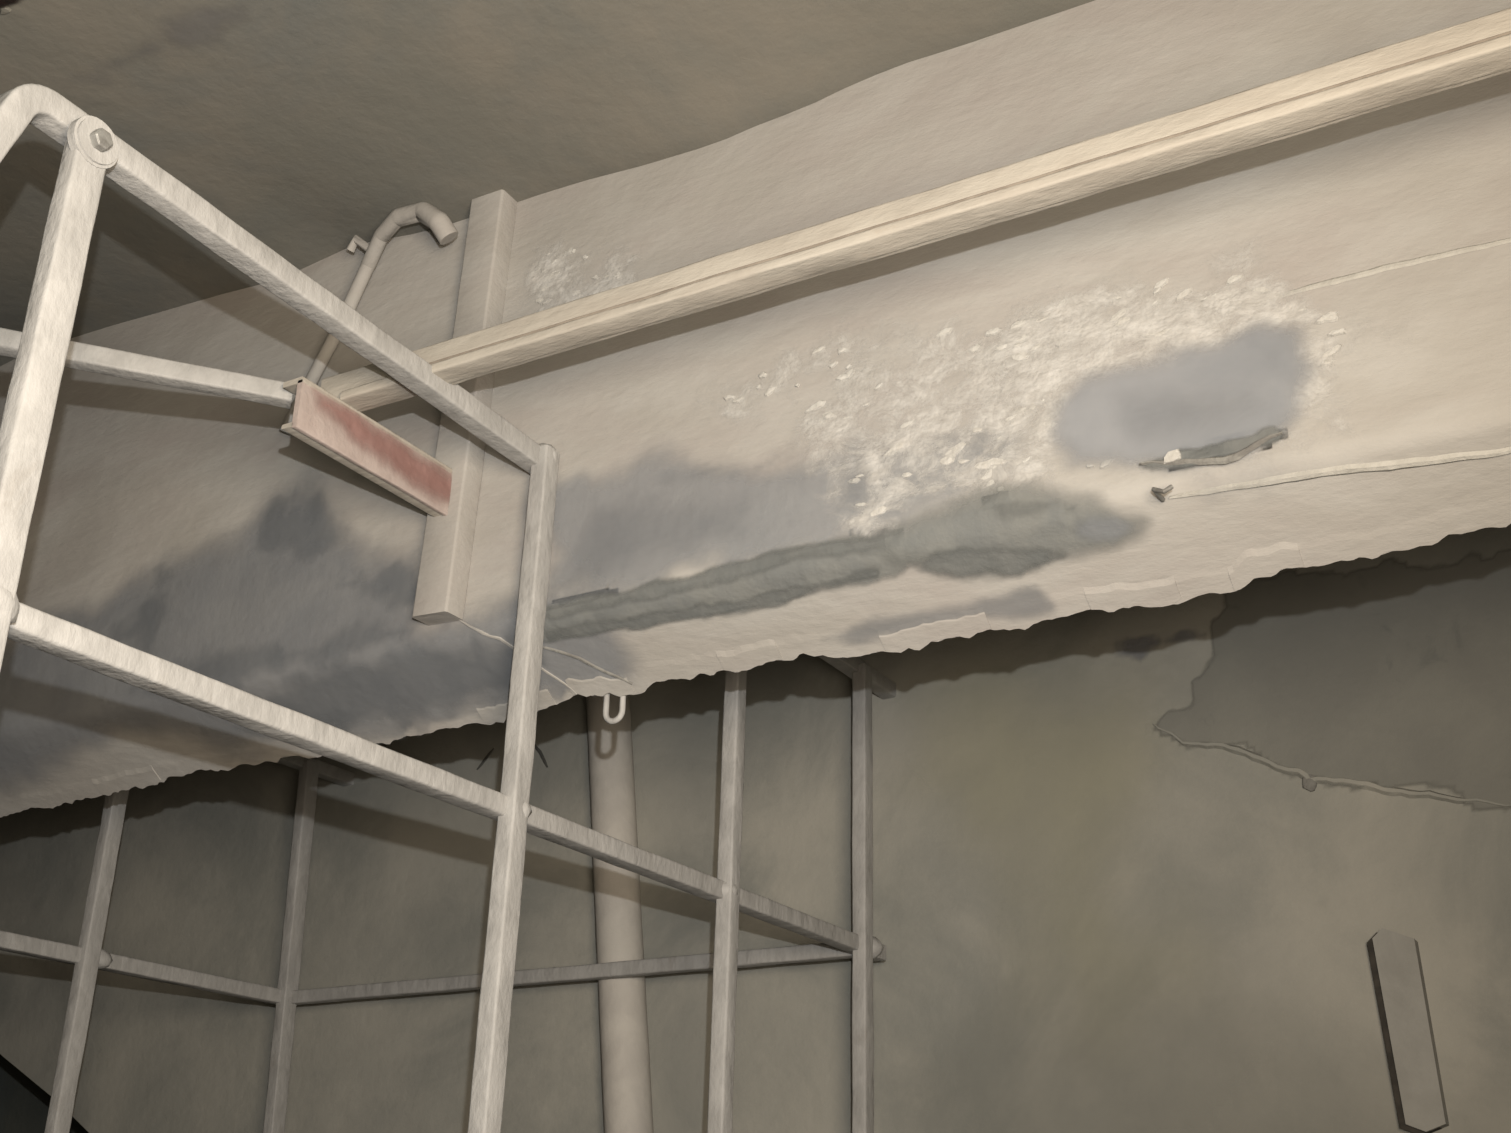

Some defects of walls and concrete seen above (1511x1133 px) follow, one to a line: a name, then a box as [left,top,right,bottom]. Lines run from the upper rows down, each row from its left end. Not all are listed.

leakage [554,249,1347,586]
spalling [1139,427,1283,468]
leakage [0,644,248,775]
flaking render [0,740,321,818]
leakage [65,501,517,729]
flaking render [346,698,509,744]
leakage [540,632,623,693]
peeling [537,495,1511,810]